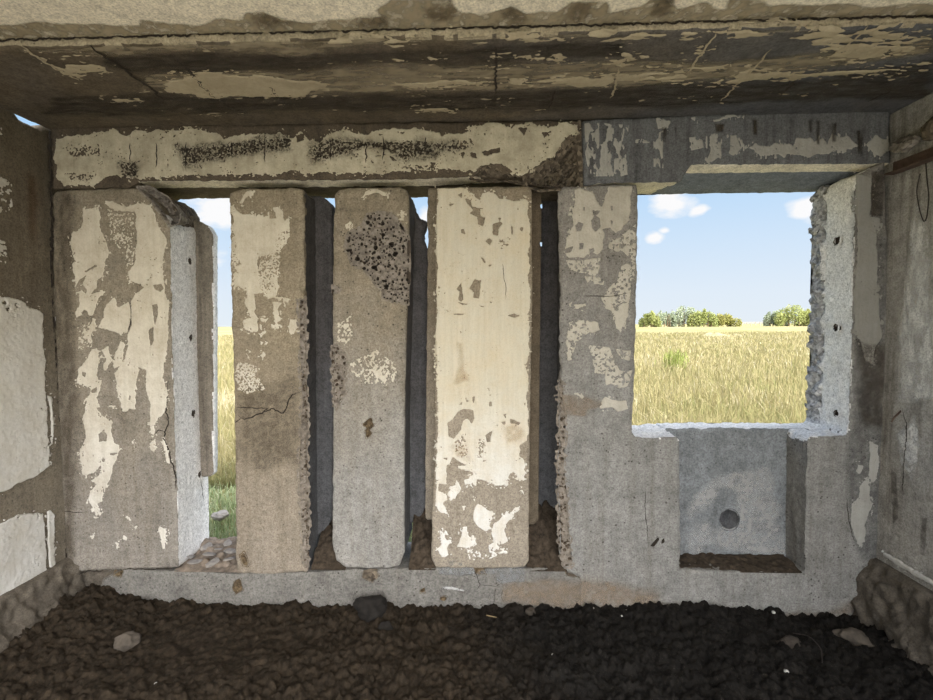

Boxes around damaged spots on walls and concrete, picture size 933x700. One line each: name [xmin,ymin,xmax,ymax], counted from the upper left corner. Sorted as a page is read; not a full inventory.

peeling [17,41,116,84]
peeling [99,70,341,106]
crack [0,15,933,101]
peeling [371,17,933,114]
water stain [174,134,290,168]
water stain [308,137,455,162]
peeling [689,133,891,165]
peeling [53,119,636,578]
peeling [0,296,57,495]
crack [235,391,302,423]
peeling [850,440,879,548]
peeling [0,509,58,595]